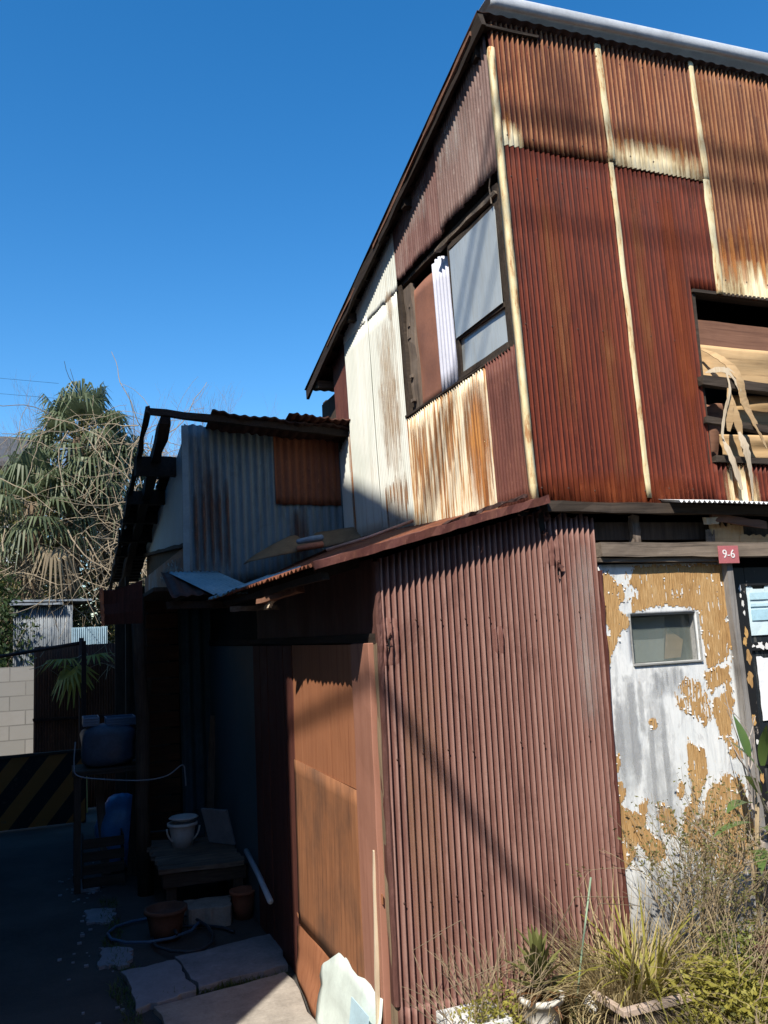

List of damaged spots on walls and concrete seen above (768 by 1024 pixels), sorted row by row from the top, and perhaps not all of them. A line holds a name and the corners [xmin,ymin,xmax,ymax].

rust [385,393,493,522]
rust [580,478,671,503]
peeling [603,563,768,879]